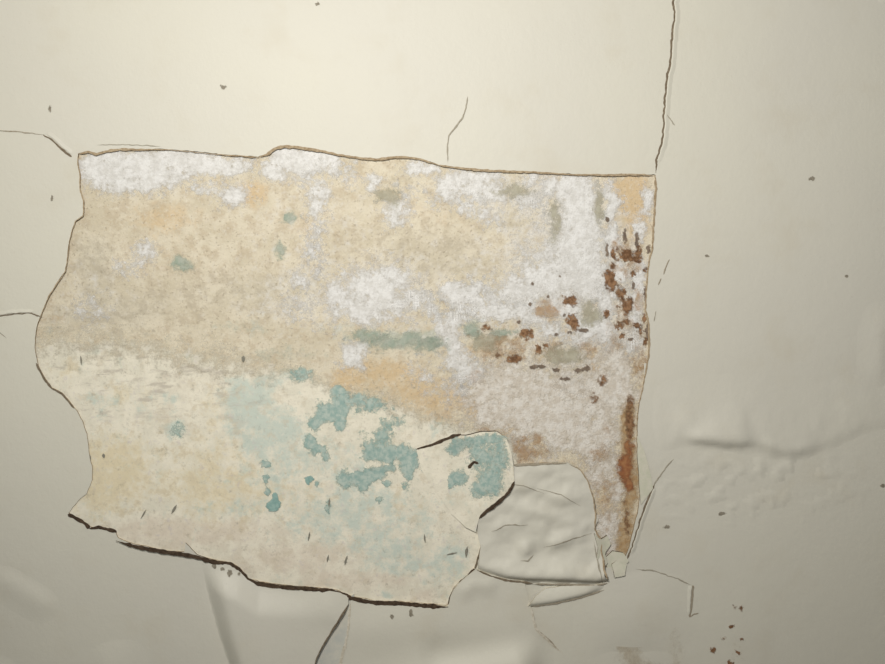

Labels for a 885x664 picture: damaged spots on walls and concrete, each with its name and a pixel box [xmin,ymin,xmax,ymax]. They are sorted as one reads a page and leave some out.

crack [655,0,680,170]
crack [0,130,73,157]
water stain [632,186,654,244]
peeling [35,145,657,609]
water stain [74,148,647,556]
rust [483,324,590,381]
rust [517,295,588,354]
rust [603,229,651,345]
rust [616,395,639,553]